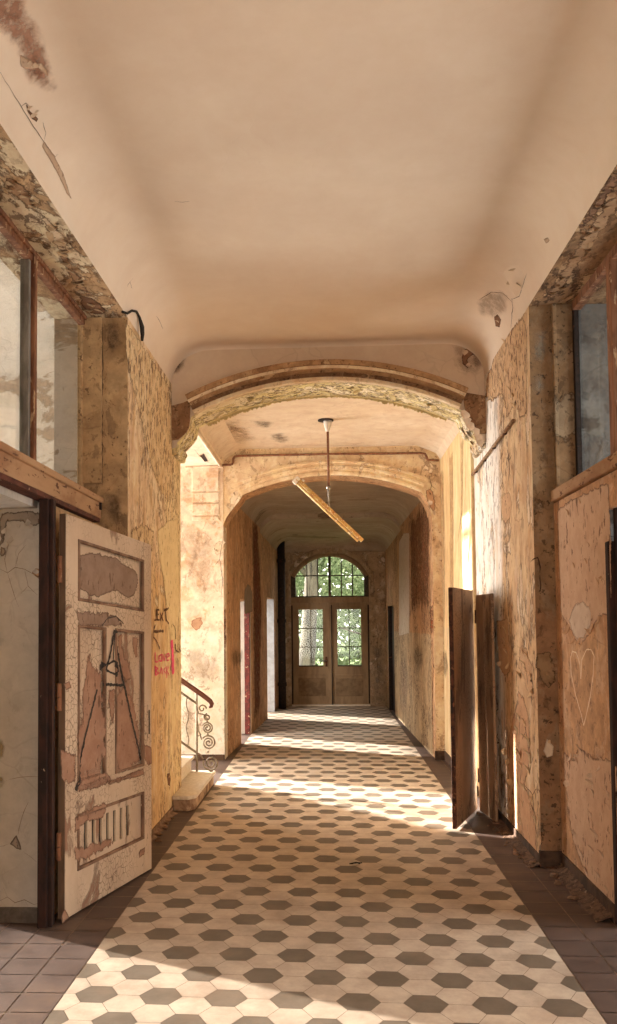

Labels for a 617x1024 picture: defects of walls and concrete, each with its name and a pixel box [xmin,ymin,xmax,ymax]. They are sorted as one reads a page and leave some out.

crack [0,72,57,157]
peeling [43,142,71,198]
peeling [5,178,105,314]
peeling [547,172,617,300]
peeling [206,388,447,426]
spalling [459,410,484,450]
peeling [485,314,527,418]
peeling [500,492,512,523]
peeling [557,484,611,647]
peeling [61,611,152,792]
peeling [536,652,558,688]
peeling [501,691,617,904]